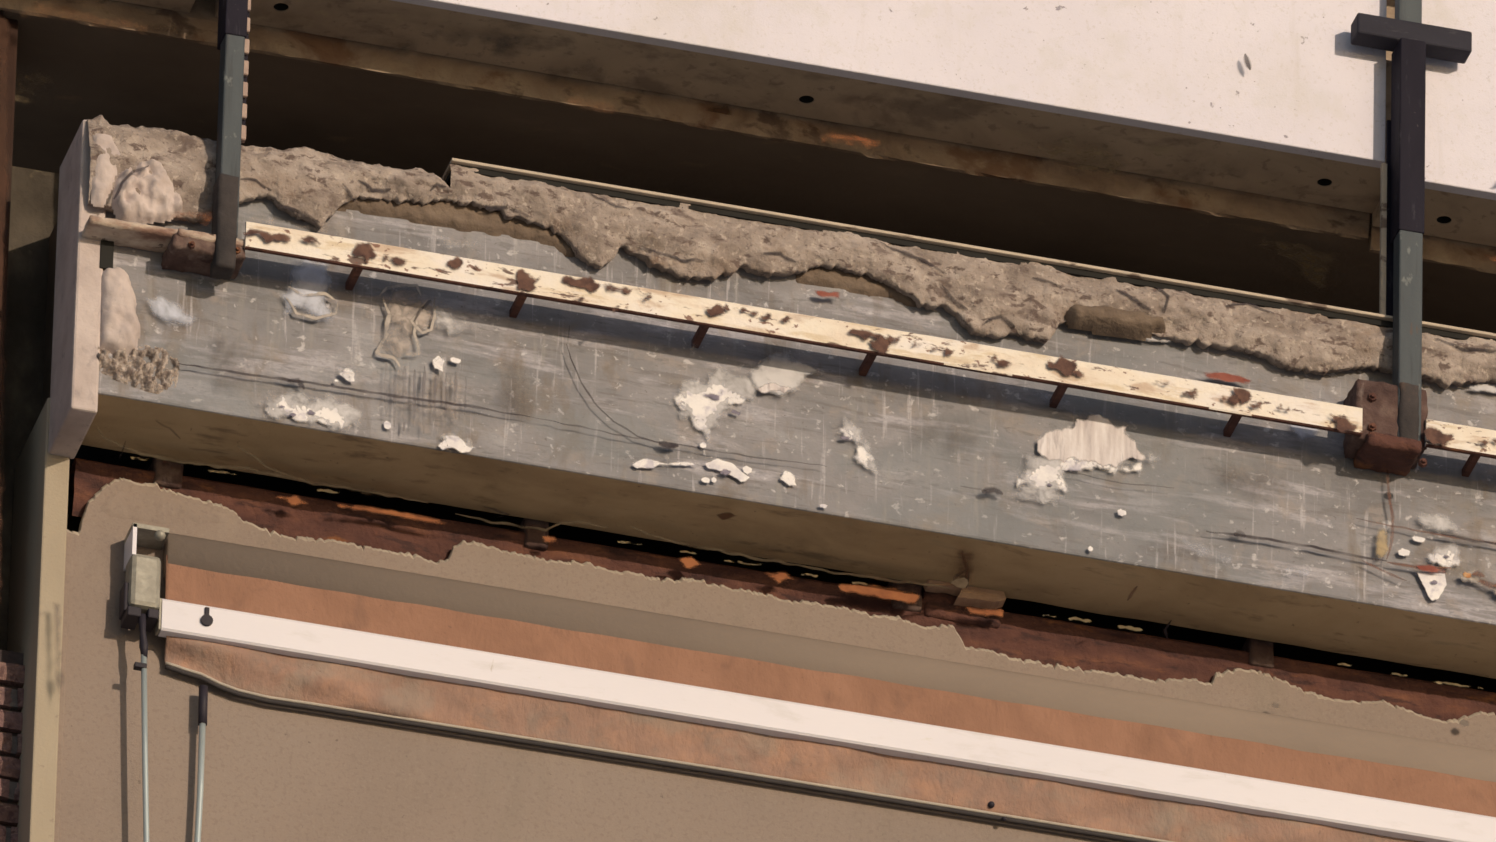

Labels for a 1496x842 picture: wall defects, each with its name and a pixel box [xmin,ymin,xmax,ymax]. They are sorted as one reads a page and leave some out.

spalling [87,115,217,224]
rust [353,242,405,265]
spalling [239,145,1393,376]
rust [562,276,652,312]
rust [706,304,791,322]
rust [849,329,954,356]
rust [1047,356,1084,377]
rust [1157,372,1290,411]
spalling [1422,333,1496,389]
peeling [633,368,757,483]
peeling [1017,414,1154,504]
peeling [1398,536,1496,601]